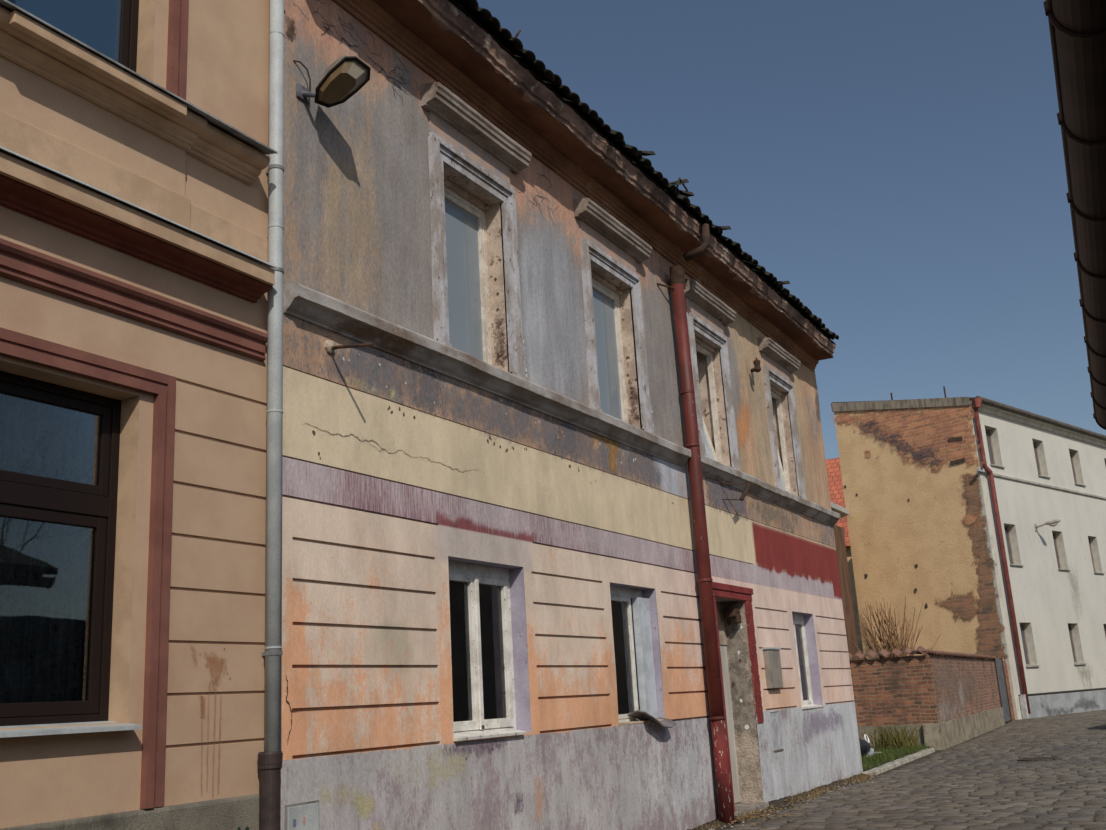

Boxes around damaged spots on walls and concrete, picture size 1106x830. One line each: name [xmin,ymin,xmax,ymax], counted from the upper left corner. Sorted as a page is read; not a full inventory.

crack [293,0,419,106]
crack [305,423,480,472]
spalling [832,404,1008,659]
crack [286,677,294,741]